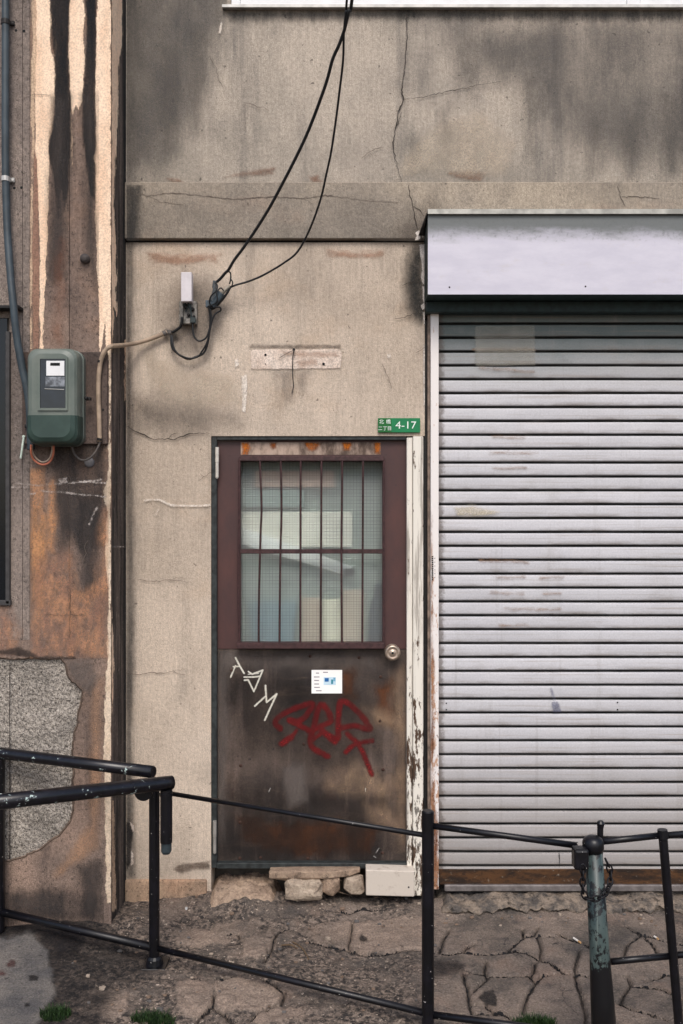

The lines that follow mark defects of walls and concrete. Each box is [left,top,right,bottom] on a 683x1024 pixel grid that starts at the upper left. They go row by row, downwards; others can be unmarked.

water stain [49,0,96,278]
crack [128,14,501,227]
water stain [232,10,683,146]
crack [128,426,210,440]
rust [31,469,107,656]
spalling [0,657,83,793]
spalling [5,801,75,862]
crack [192,907,590,1024]
crack [619,928,683,1020]